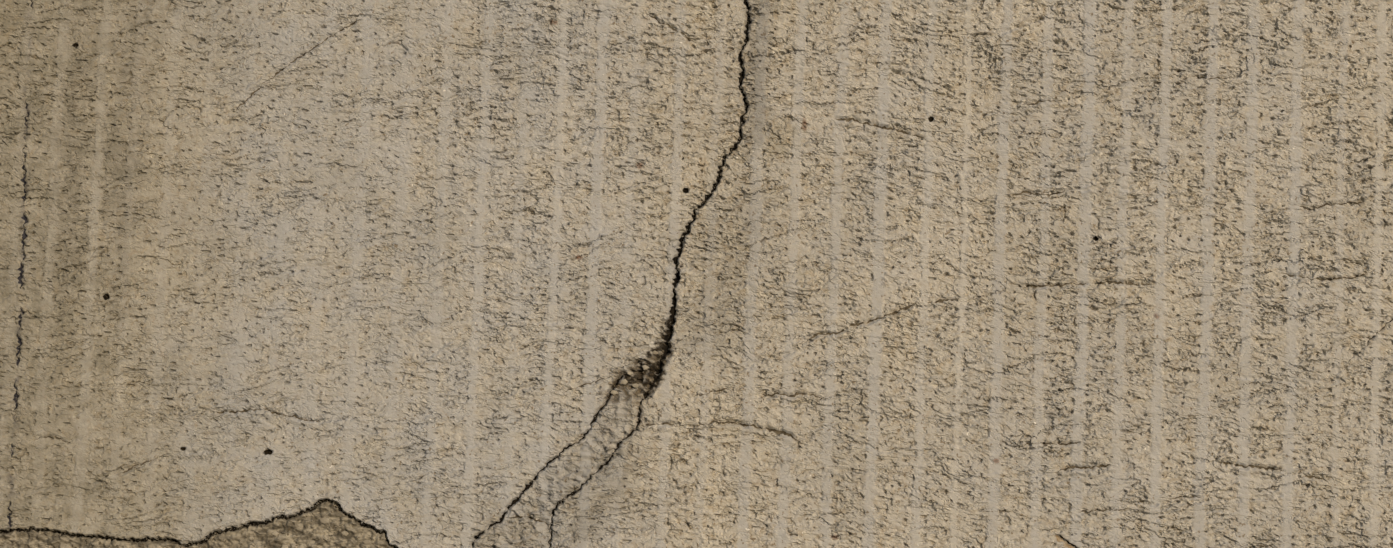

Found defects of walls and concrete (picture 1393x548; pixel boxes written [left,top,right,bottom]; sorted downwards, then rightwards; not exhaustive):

spalling [0,499,398,548]
crack [472,0,823,548]